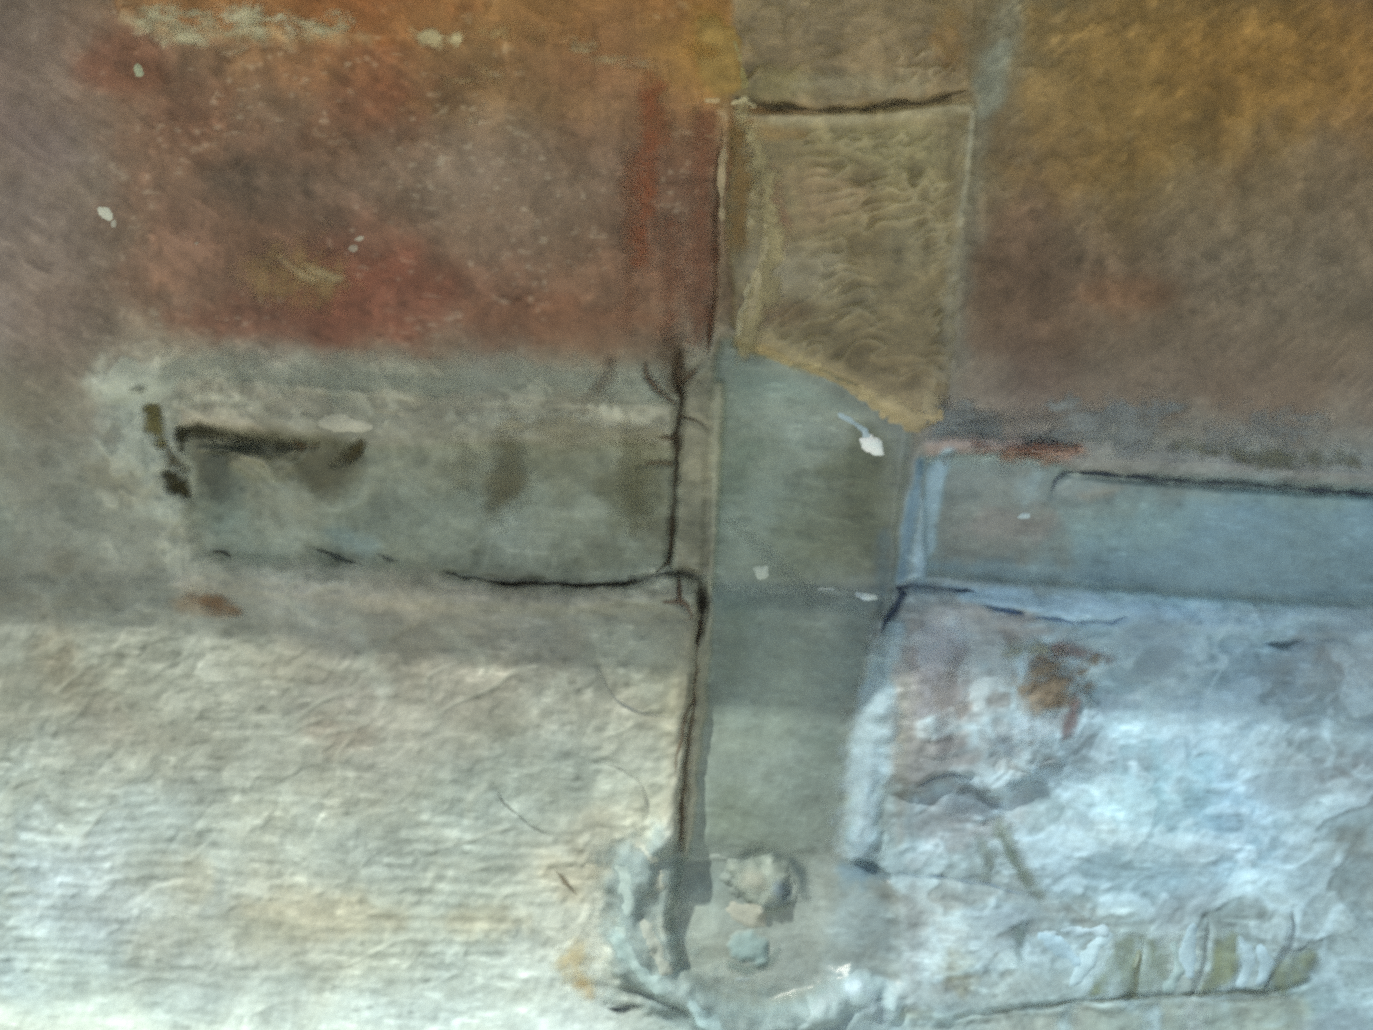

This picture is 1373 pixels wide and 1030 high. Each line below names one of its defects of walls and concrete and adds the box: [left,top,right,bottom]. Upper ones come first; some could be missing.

spalling [144,405,257,497]
crack [447,153,719,844]
rust [1011,644,1098,734]